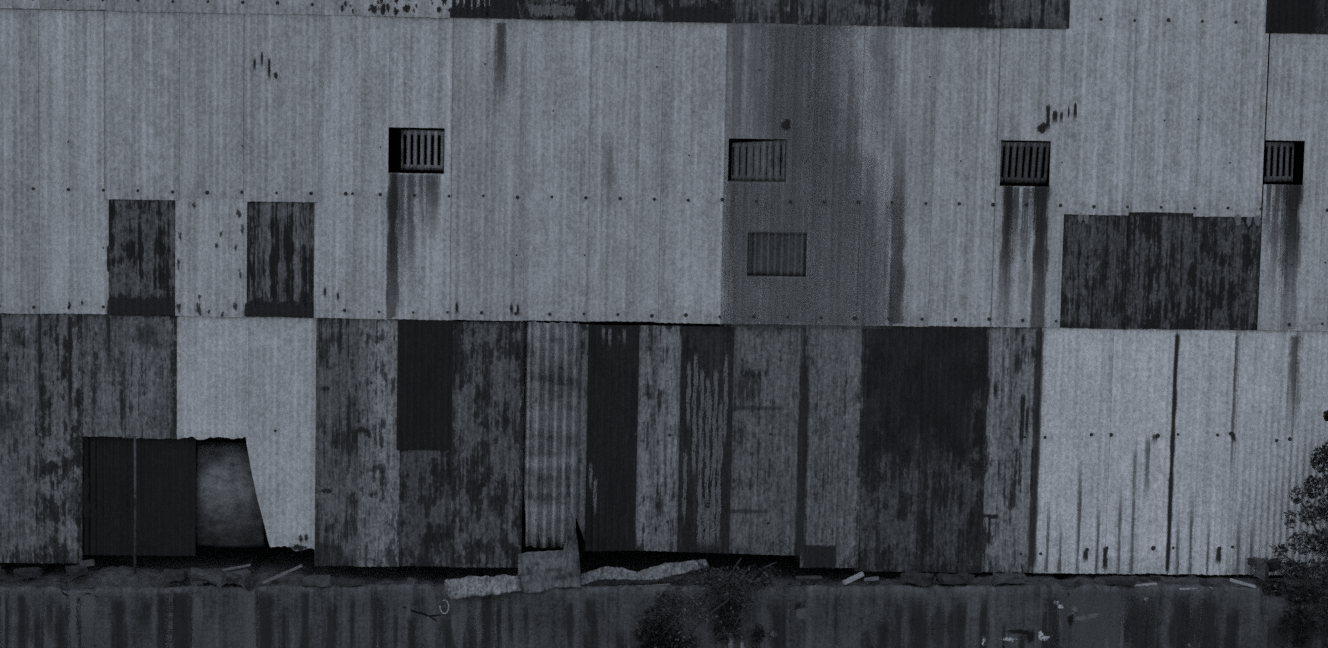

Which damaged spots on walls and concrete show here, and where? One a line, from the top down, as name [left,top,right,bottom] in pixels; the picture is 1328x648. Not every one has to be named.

corrosion [386,173,440,300]
corrosion [1000,186,1050,307]
corrosion [1267,185,1304,265]
corrosion [1288,337,1299,385]
corrosion [859,326,997,483]
corrosion [1020,395,1029,444]
water stain [0,593,96,648]
water stain [142,595,203,648]
water stain [244,593,354,648]
water stain [443,597,527,648]
water stain [862,605,1025,648]
water stain [1042,602,1059,648]